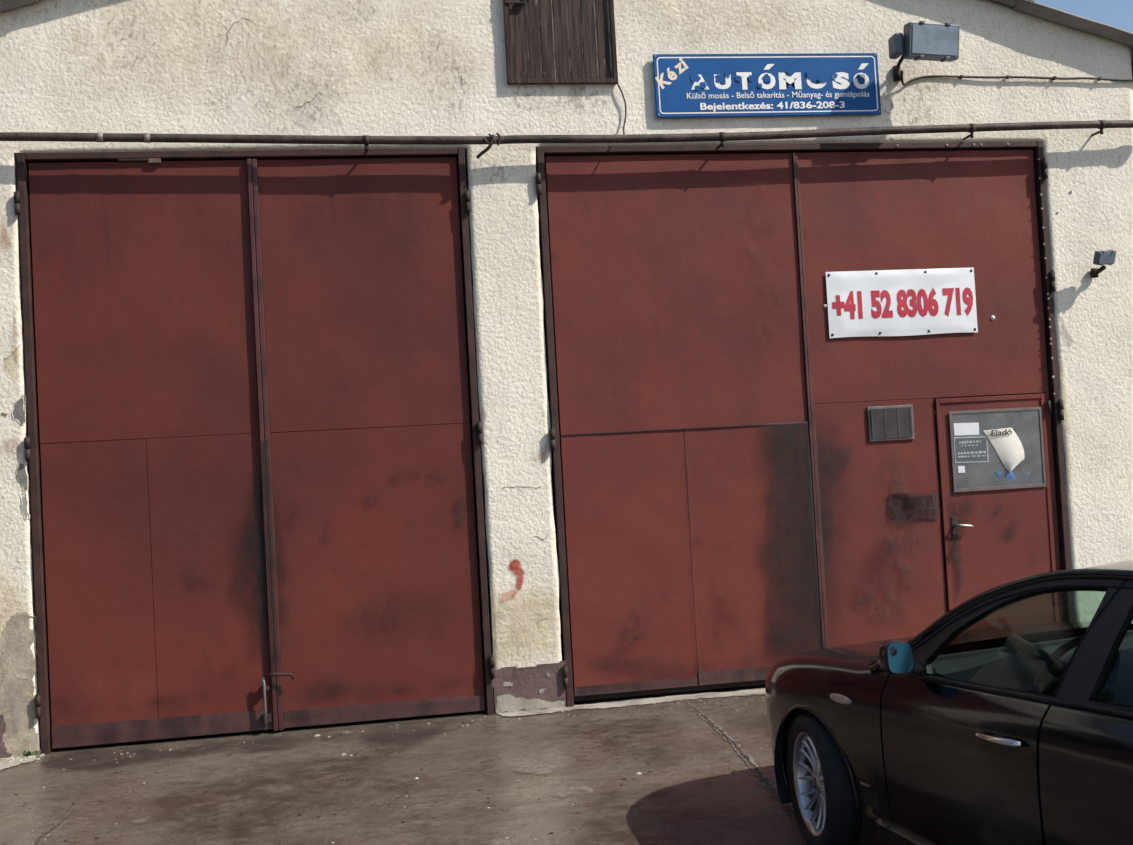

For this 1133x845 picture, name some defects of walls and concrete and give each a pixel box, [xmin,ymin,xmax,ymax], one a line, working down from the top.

flaking render [1,394,27,426]
flaking render [0,612,39,757]
flaking render [495,672,565,713]